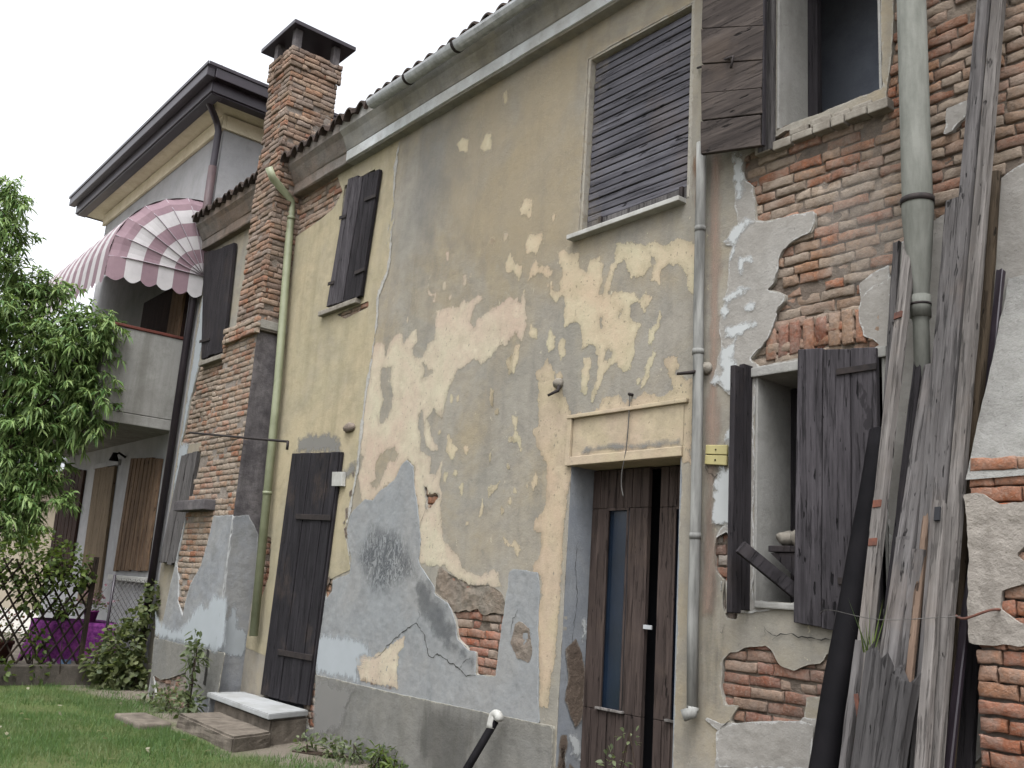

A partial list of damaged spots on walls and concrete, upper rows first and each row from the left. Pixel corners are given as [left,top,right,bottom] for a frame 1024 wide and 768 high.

flaking render [298,177,342,235]
peeling [456,133,492,153]
flaking render [711,1,904,548]
flaking render [926,0,977,363]
flaking render [992,0,1024,314]
peeling [340,142,695,768]
peeling [887,310,914,570]
water stain [364,536,407,583]
crack [376,614,475,677]
peeling [712,466,775,619]
flaking render [705,646,827,768]
crack [764,627,829,642]